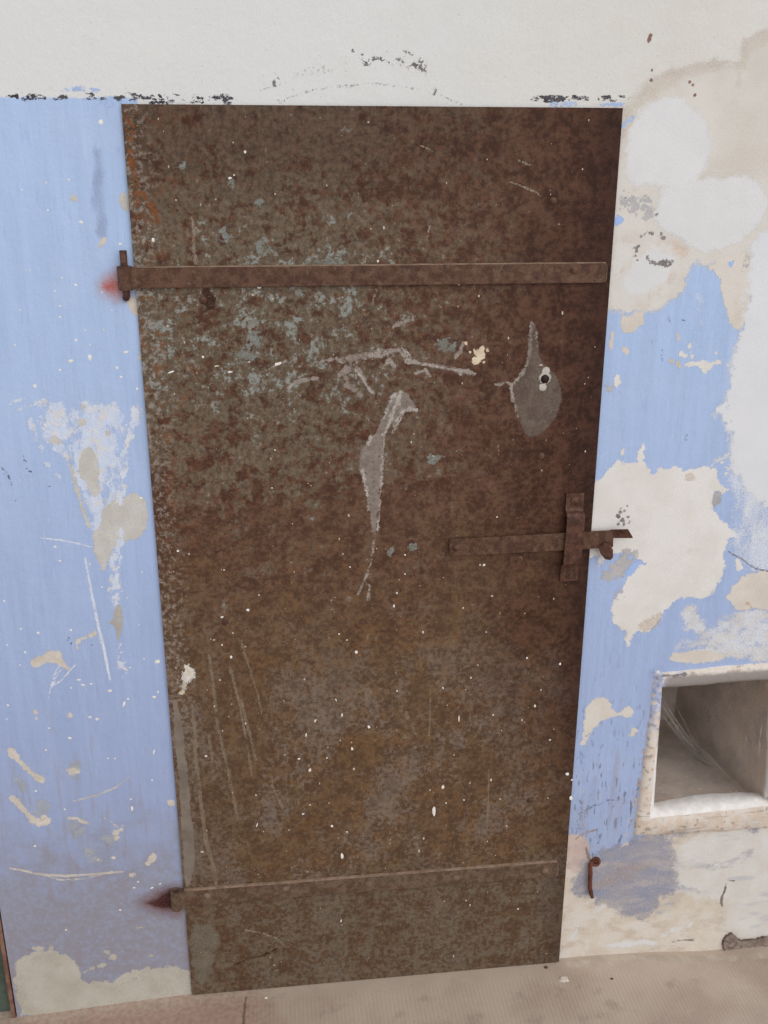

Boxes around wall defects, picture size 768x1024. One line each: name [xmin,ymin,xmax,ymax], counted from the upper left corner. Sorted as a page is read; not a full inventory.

rust [122,115,159,224]
leakage [619,189,659,221]
rust [95,261,136,305]
peeling [608,227,755,355]
peeling [668,333,721,374]
peeling [9,396,149,679]
peeling [589,443,768,647]
flaking render [559,697,768,959]
rust [134,882,185,920]
peeling [13,944,192,1017]